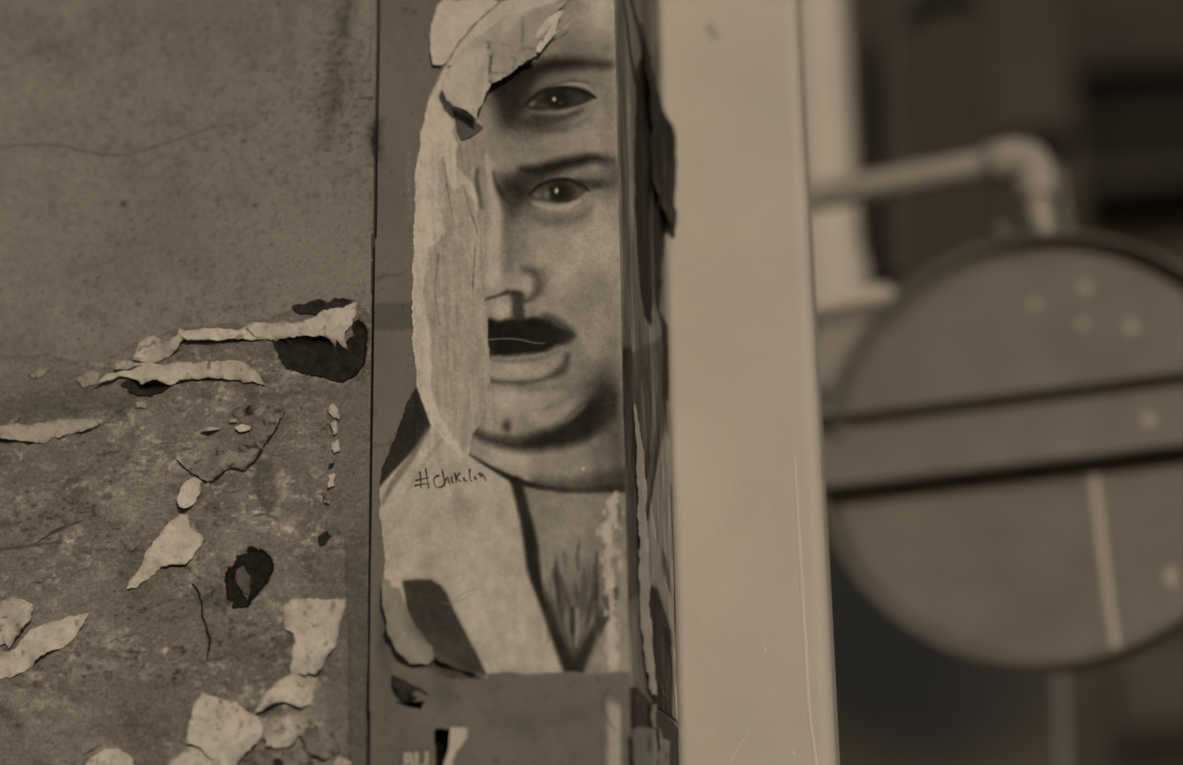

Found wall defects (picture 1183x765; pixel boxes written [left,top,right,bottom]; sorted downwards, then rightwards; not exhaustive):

peeling [76,302,357,388]
peeling [0,417,100,444]
peeling [127,403,284,589]
peeling [322,403,341,504]
flaking render [235,566,251,600]
peeling [0,597,89,679]
peeling [170,598,352,765]
peeling [86,748,134,765]